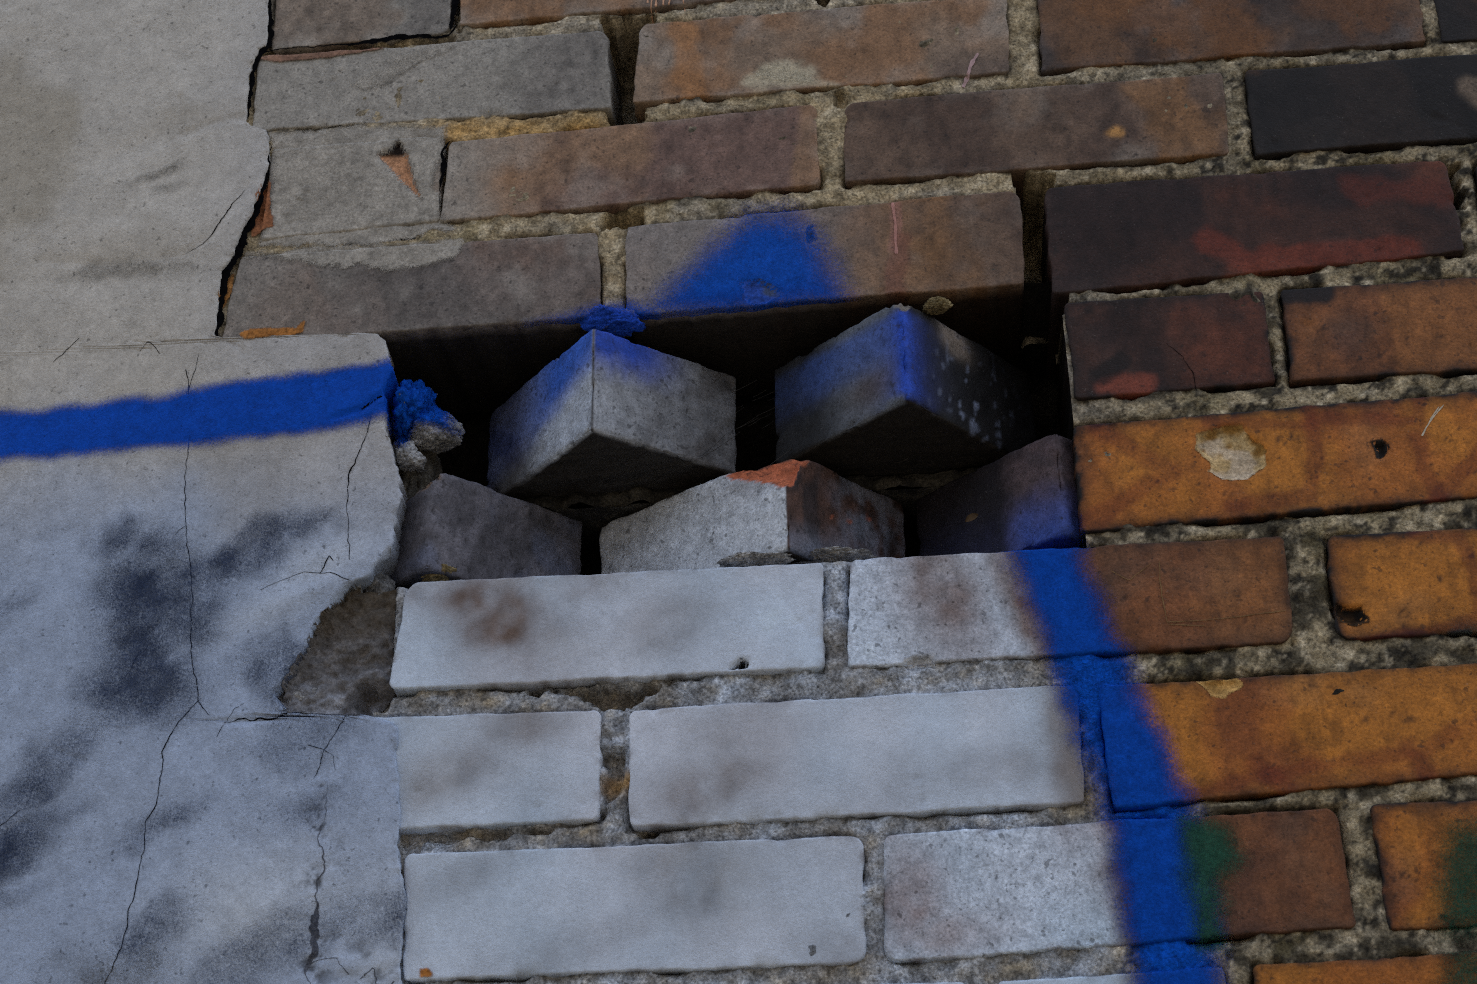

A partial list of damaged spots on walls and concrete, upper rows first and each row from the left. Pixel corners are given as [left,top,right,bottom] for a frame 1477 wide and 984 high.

crack [143,0,459,392]
crack [266,395,392,587]
spalling [1195,425,1266,480]
crack [104,445,287,983]
spalling [277,572,397,716]
crack [304,719,395,984]